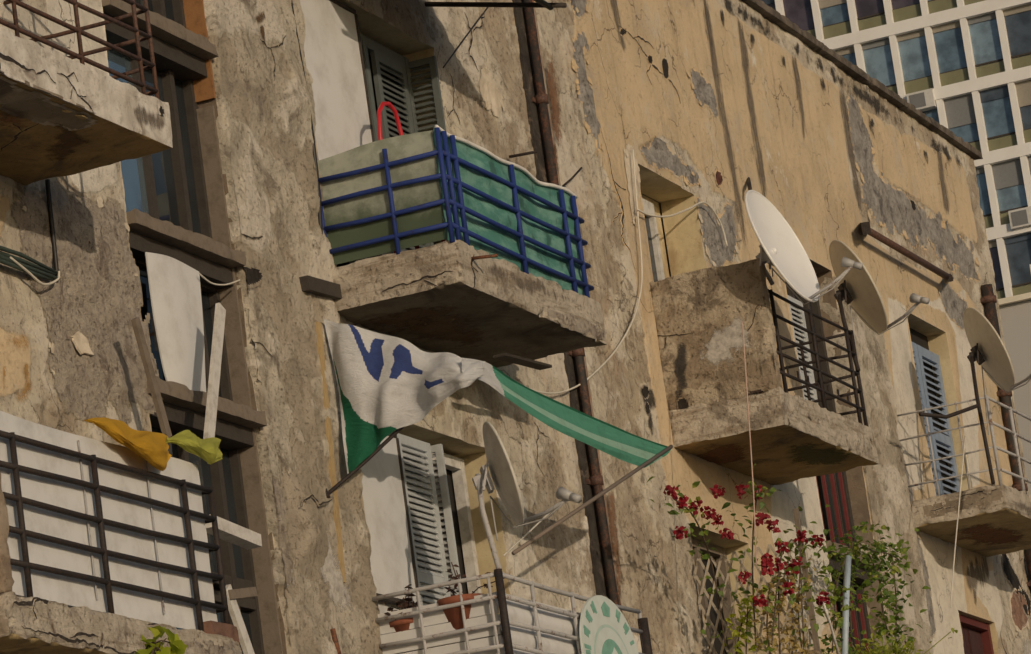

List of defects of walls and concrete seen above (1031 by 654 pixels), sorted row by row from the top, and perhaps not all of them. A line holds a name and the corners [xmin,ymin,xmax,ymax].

crack [0,51,93,112]
crack [619,26,681,104]
peeling [687,67,718,119]
peeling [624,136,739,267]
peeling [847,95,981,331]
leakage [787,443,851,465]
rust [608,492,622,605]
crack [12,597,136,654]